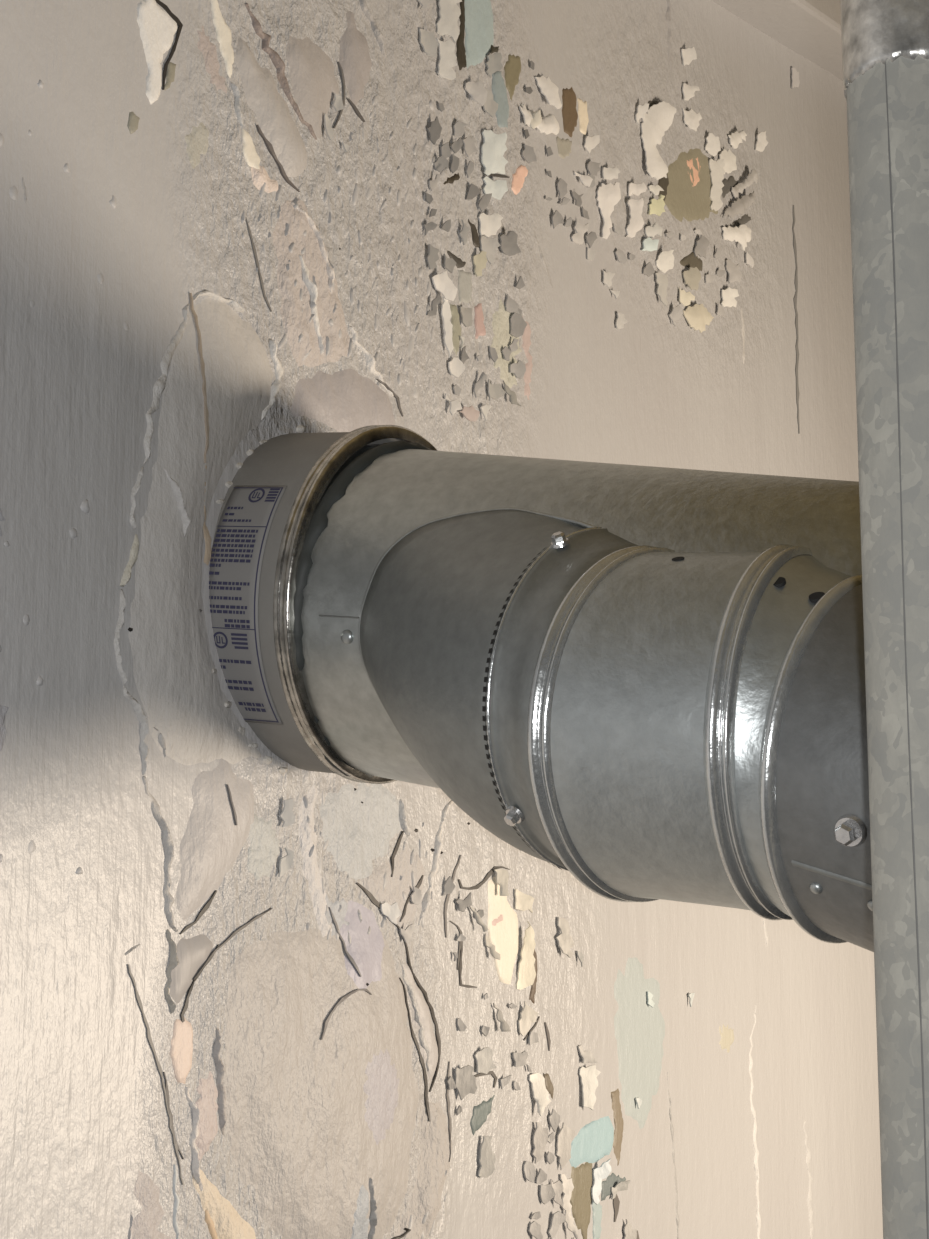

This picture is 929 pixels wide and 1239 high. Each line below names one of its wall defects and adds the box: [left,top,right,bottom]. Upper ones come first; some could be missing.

peeling [137,0,178,104]
peeling [210,0,234,78]
peeling [242,129,260,170]
peeling [419,0,768,421]
crack [127,964,184,1185]
peeling [169,1017,193,1084]
crack [180,890,217,934]
crack [180,908,273,1023]
crack [320,907,372,1040]
crack [356,831,510,1162]
peeling [442,869,631,1239]
crack [391,1229,411,1239]